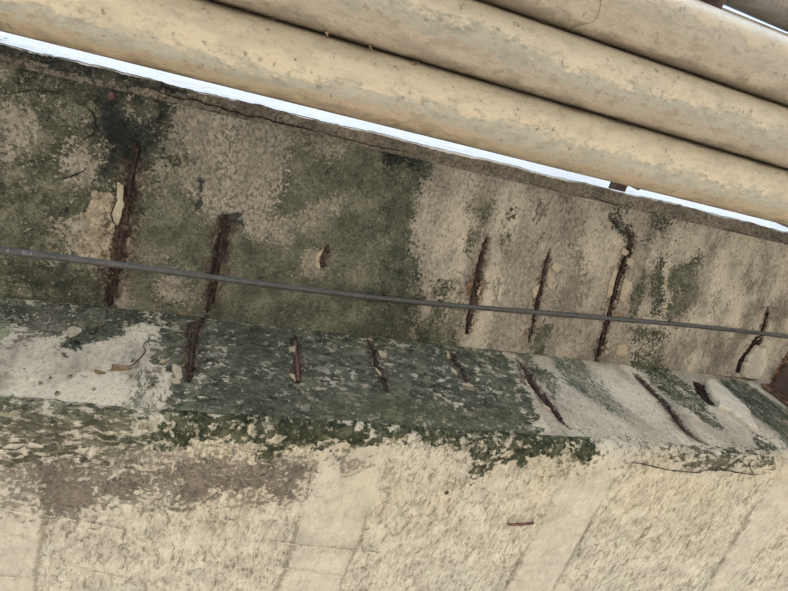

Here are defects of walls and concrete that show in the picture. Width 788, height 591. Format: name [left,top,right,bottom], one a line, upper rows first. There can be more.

crack [0,88,60,96]
water stain [0,45,190,225]
water stain [382,152,424,174]
water stain [195,178,205,210]
water stain [216,212,245,230]
water stain [610,216,634,242]
flaking render [94,360,140,375]
flaking render [693,379,758,431]
crack [629,462,767,475]